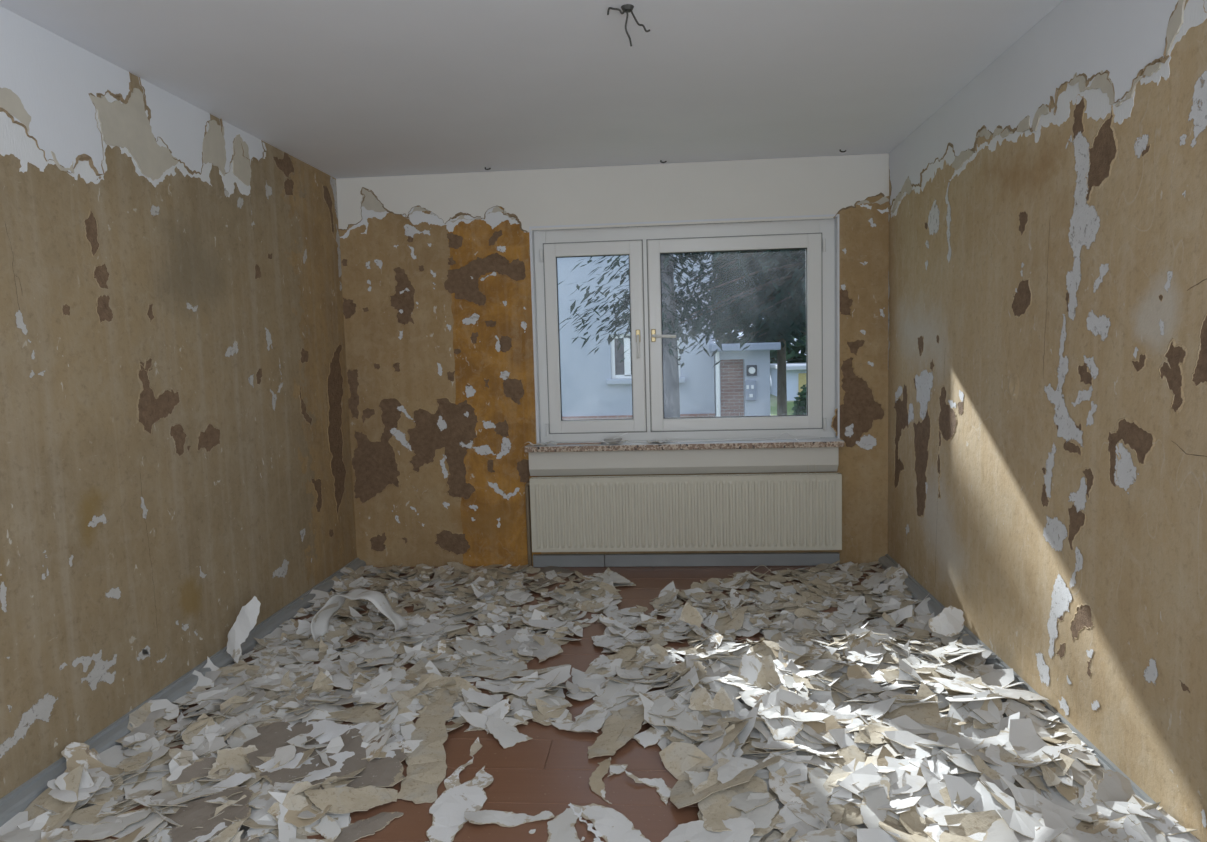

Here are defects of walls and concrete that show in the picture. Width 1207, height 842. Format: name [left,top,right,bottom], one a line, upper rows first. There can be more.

peeling [1180,71,1207,148]
spalling [322,176,527,355]
spalling [840,284,854,317]
spalling [1019,211,1029,236]
spalling [136,356,221,457]
spalling [310,343,531,556]
spalling [831,330,964,535]
peeling [1036,94,1156,687]
spalling [1131,312,1207,415]
peeling [272,559,289,578]
peeling [1058,675,1072,716]
peeling [1143,659,1159,686]